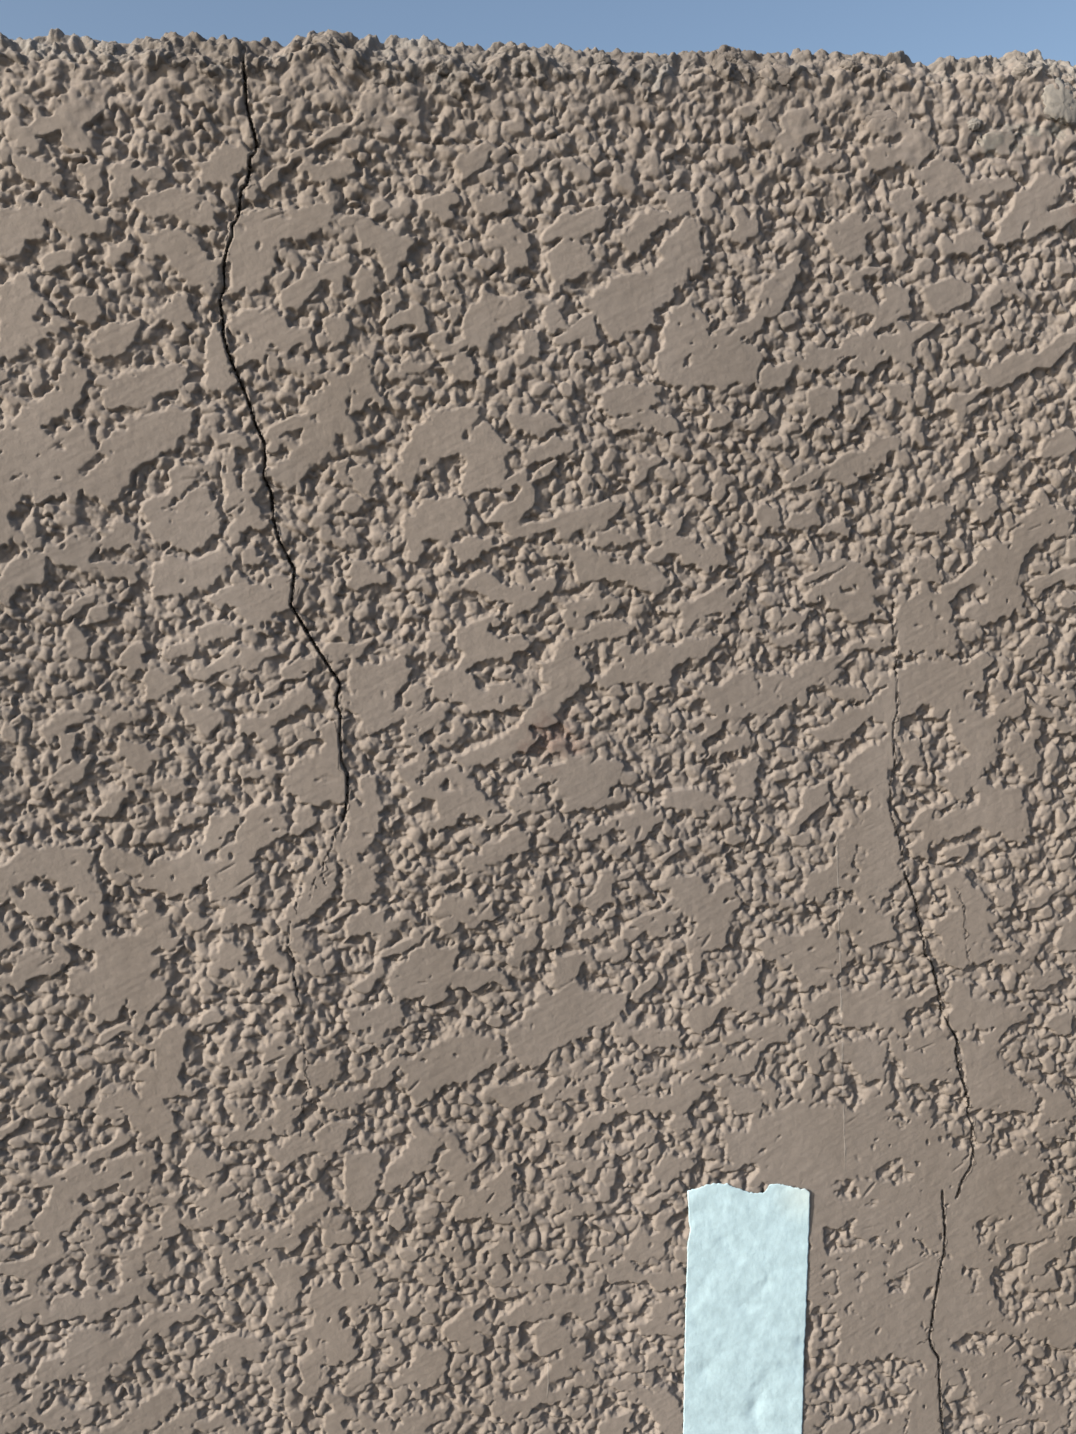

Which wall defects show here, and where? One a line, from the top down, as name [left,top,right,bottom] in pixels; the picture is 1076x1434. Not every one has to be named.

crack [217,58,349,880]
crack [889,597,977,1434]